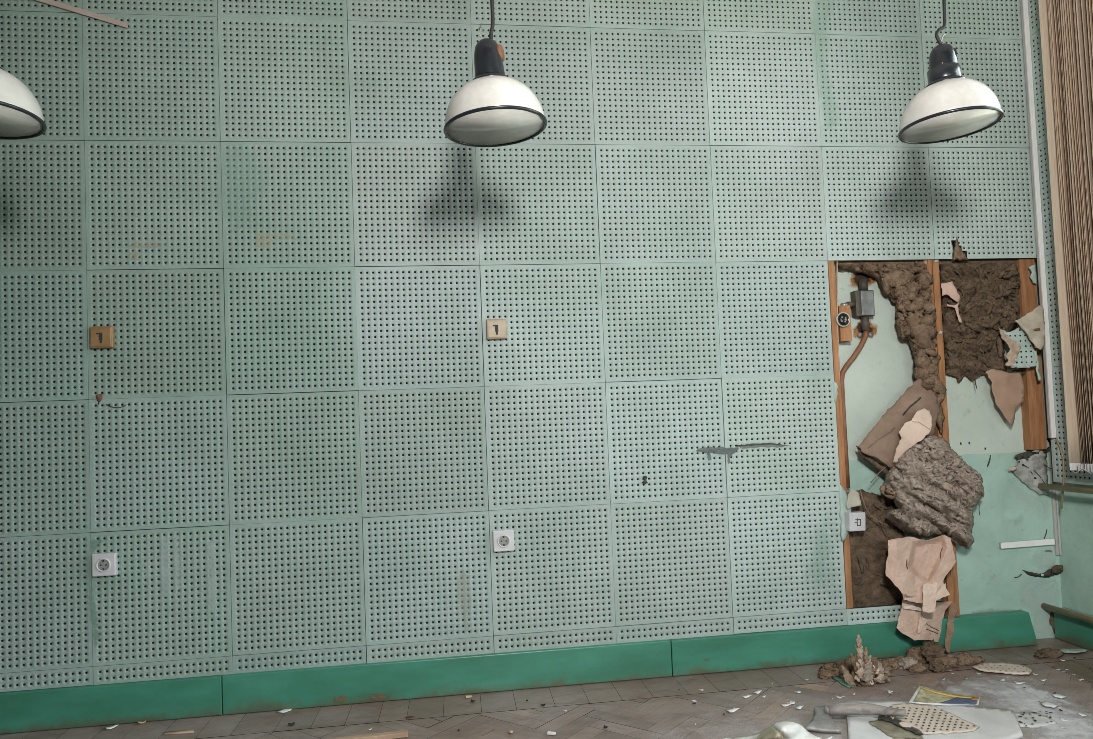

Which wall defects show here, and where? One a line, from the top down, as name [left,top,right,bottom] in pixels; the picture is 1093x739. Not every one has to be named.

spalling [1008,438,1051,496]